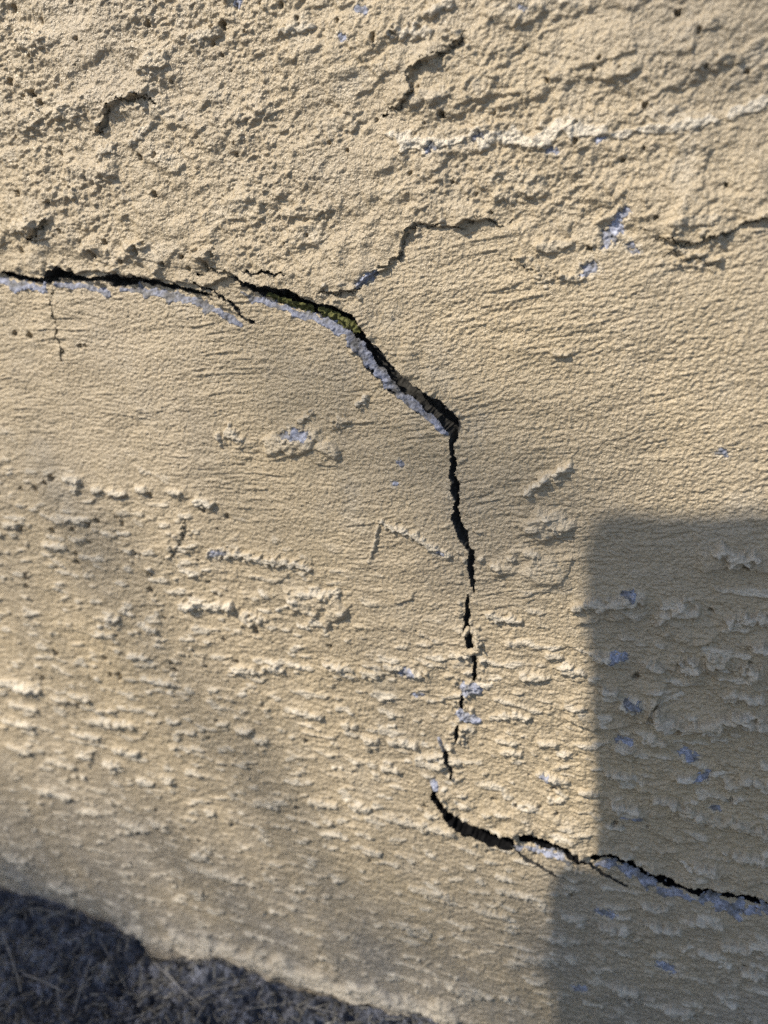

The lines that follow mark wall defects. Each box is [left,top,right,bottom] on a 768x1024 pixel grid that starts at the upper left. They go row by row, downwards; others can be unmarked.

crack [0,213,768,922]